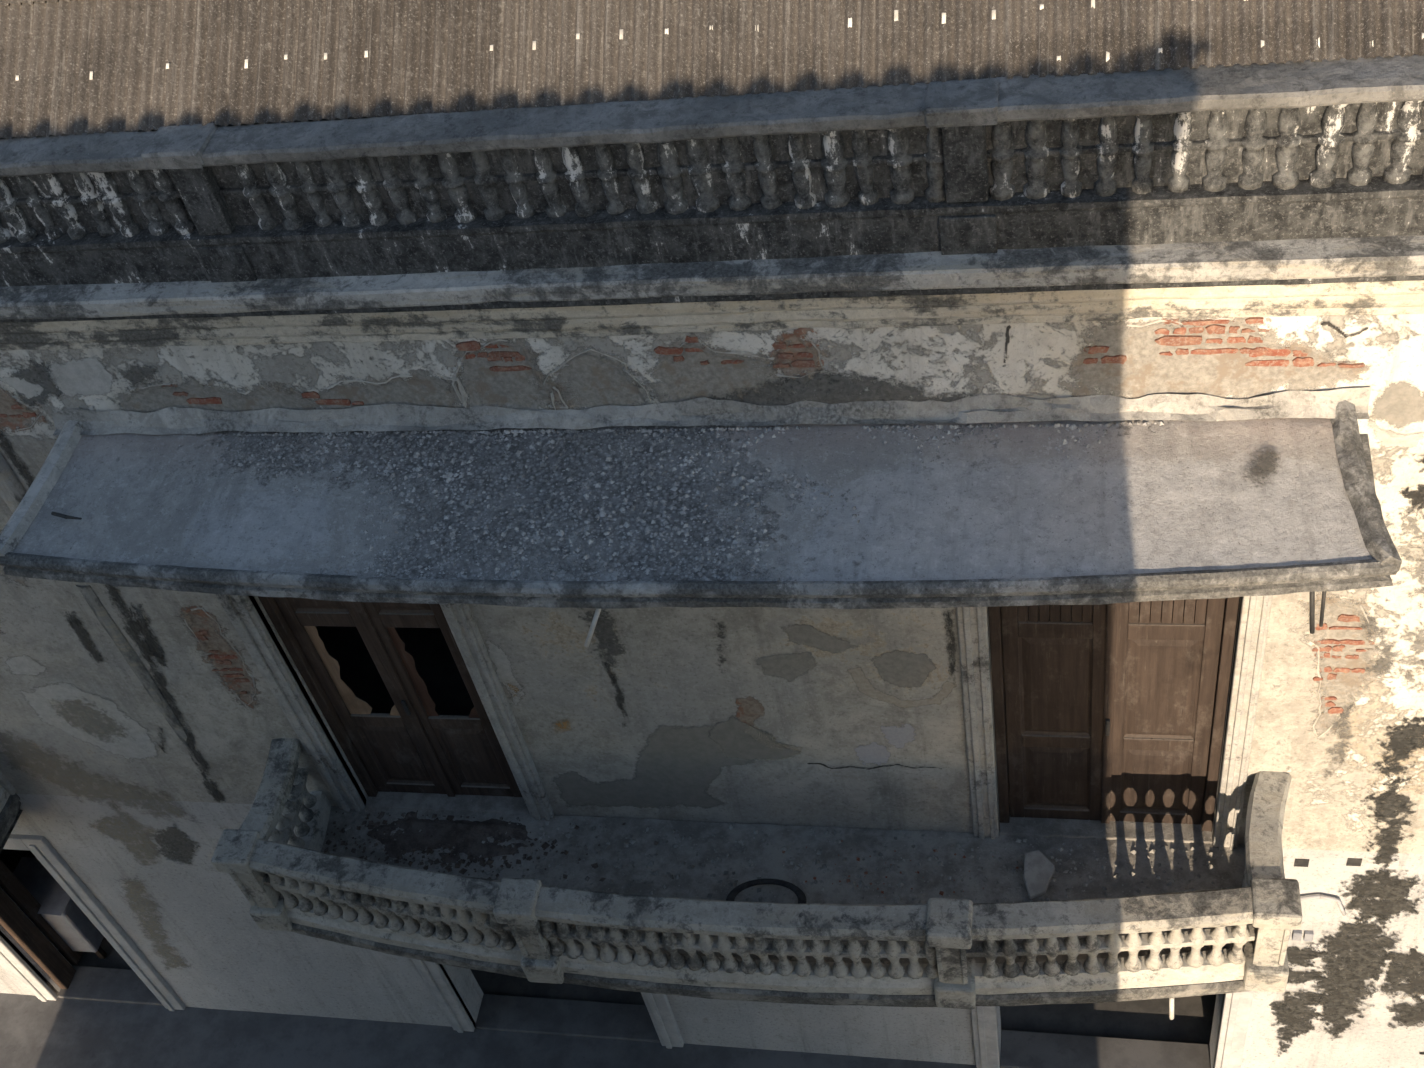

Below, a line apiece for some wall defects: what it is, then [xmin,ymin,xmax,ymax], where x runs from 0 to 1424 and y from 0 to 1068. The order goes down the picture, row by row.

flaking render [0,328,831,433]
flaking render [1058,317,1370,399]
spalling [230,426,860,581]
leakage [1361,455,1424,690]
leakage [67,612,103,662]
leakage [105,584,224,803]
flaking render [180,606,260,708]
leakage [579,609,627,726]
peeling [757,624,858,682]
leakage [1324,697,1353,778]
flaking render [1298,591,1383,740]
leakage [1269,717,1424,1057]